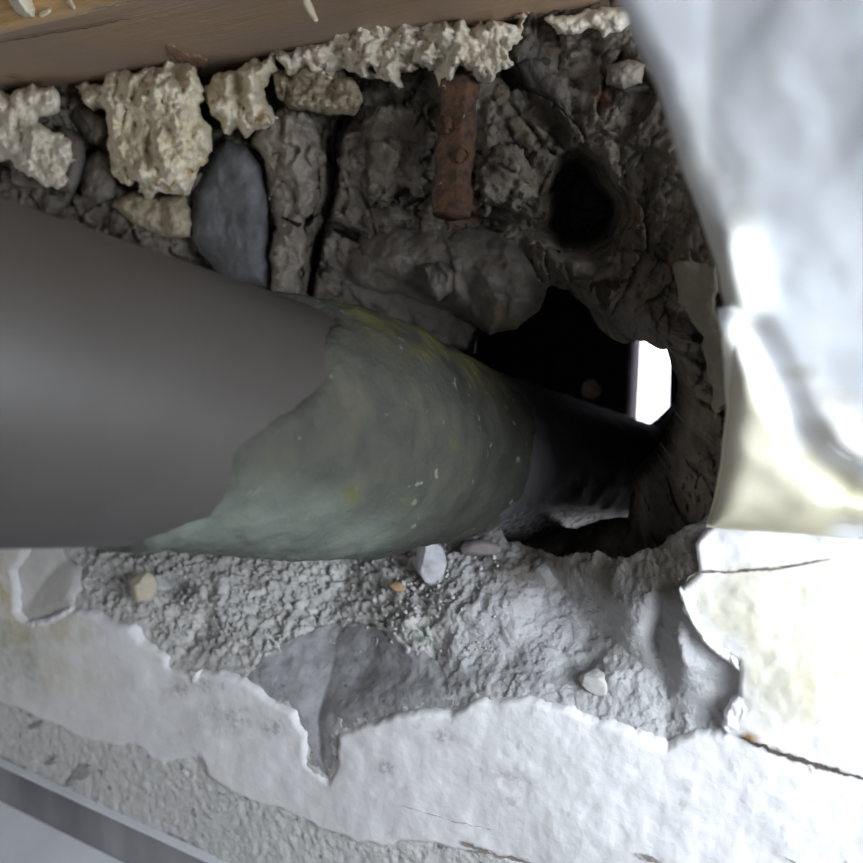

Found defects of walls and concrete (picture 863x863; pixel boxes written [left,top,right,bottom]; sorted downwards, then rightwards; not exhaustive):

corrosion [431,74,479,221]
spalling [544,150,632,254]
crack [687,559,831,580]
spalling [18,515,747,781]
water stain [704,562,863,720]
crack [742,735,863,780]
crack [454,822,528,863]